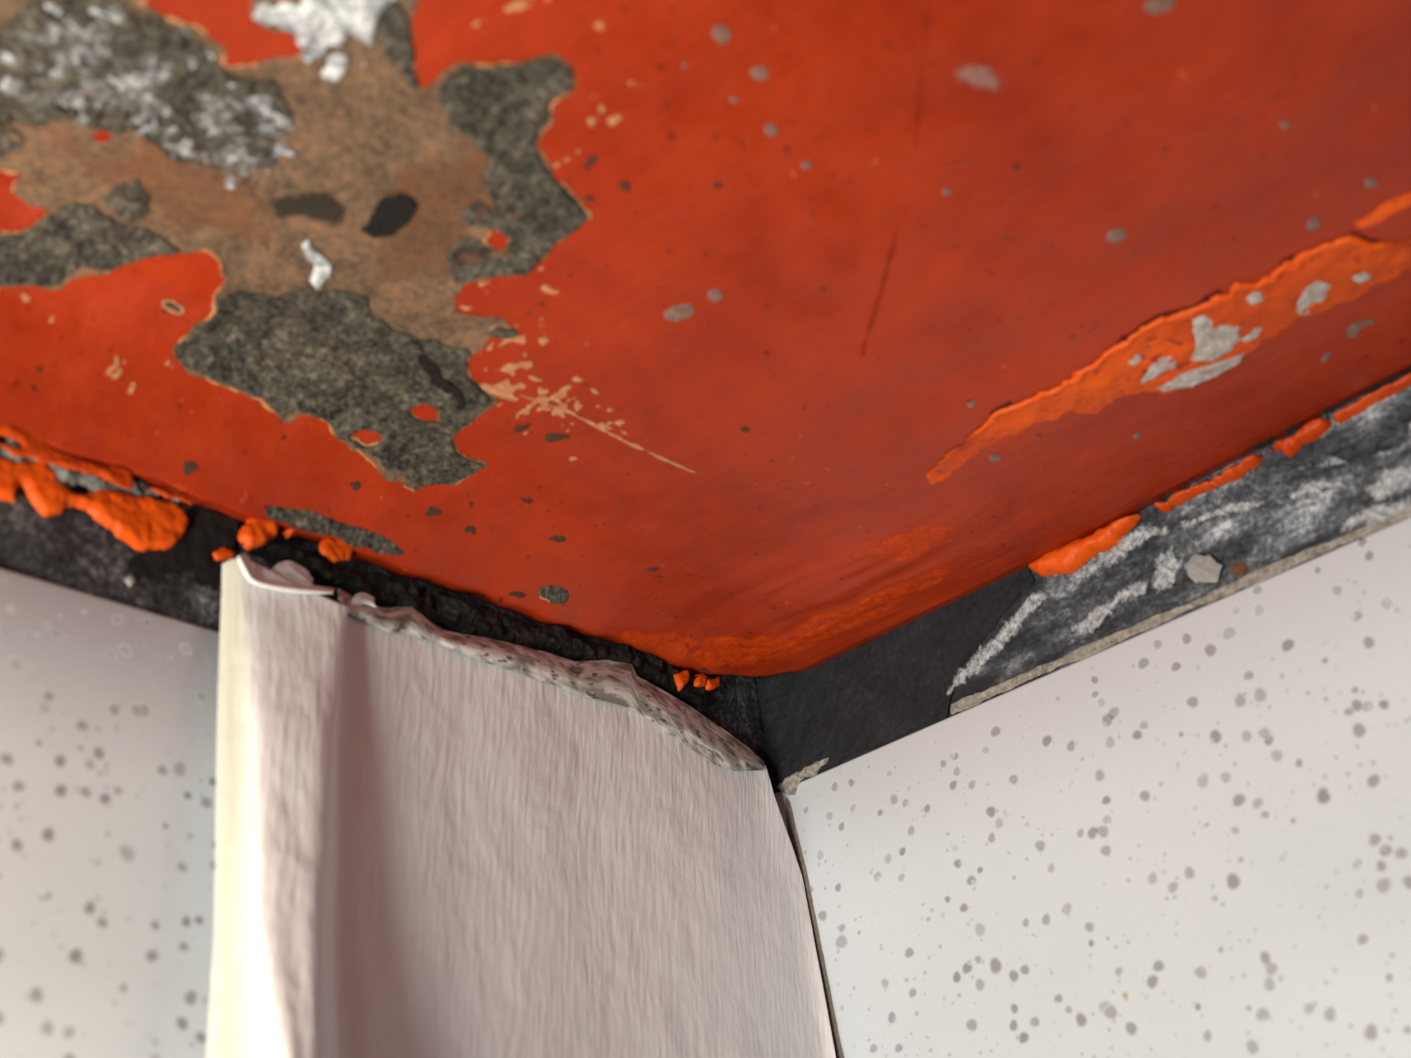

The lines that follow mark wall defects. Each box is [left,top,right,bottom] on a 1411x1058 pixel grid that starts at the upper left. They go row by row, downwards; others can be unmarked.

peeling [0,0,597,492]
peeling [925,193,1411,485]
spalling [0,424,240,591]
peeling [509,585,569,604]
peeling [622,569,948,673]
leakage [756,567,1045,785]
leakage [1072,501,1263,634]
leakage [1291,458,1342,499]